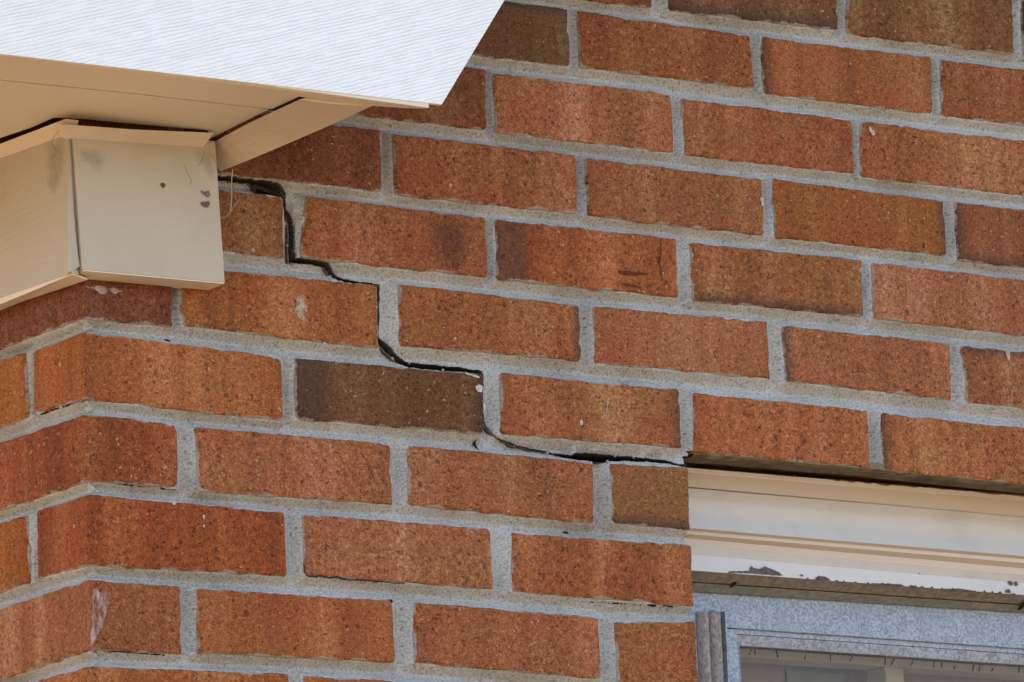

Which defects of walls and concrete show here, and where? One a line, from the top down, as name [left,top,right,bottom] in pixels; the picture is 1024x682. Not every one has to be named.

crack [217,175,687,468]
peeling [728,566,783,576]
peeling [800,573,1018,595]